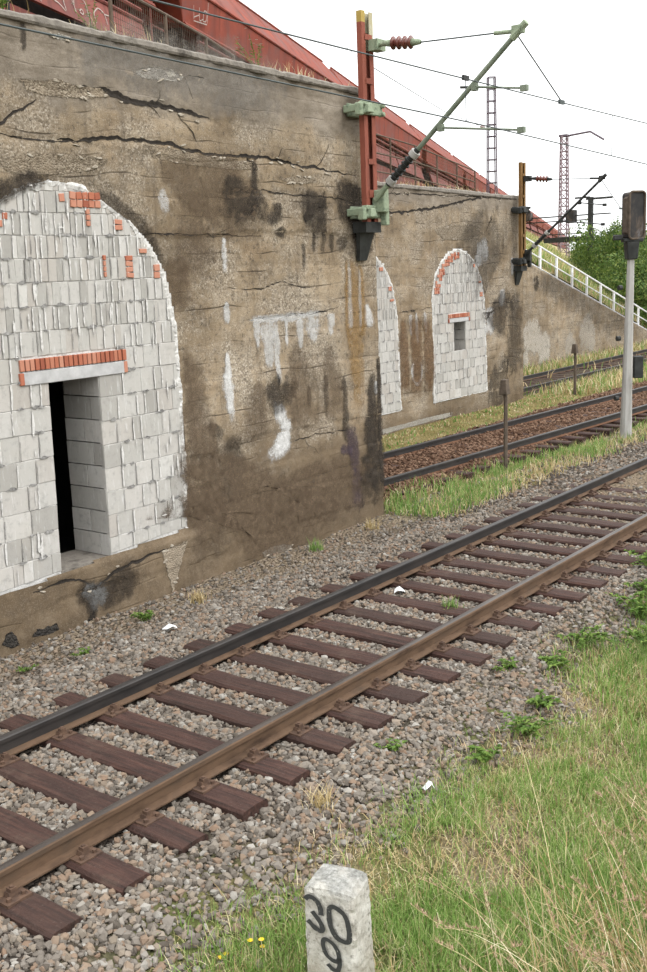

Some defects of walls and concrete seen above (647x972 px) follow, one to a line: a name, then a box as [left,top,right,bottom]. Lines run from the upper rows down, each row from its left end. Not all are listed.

spalling [20,78,109,101]
spalling [136,66,184,82]
crack [0,67,356,202]
leakage [163,158,286,305]
leakage [302,182,362,263]
leakage [486,290,521,405]
leakage [181,311,385,560]
leakage [76,566,136,620]